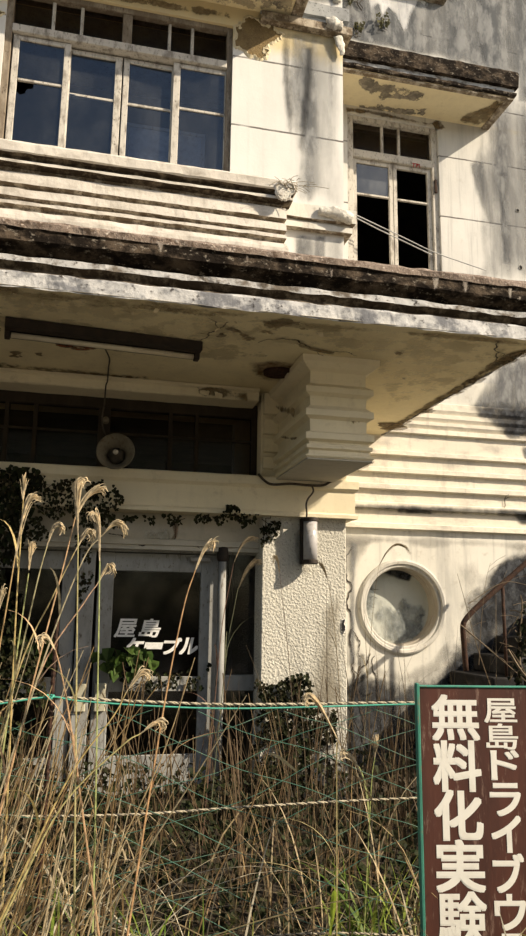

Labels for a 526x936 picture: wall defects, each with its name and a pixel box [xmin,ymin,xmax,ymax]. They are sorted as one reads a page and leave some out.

flaking render [121,0,292,61]
leakage [285,39,319,193]
peeling [346,76,444,130]
leakage [297,236,324,256]
leakage [477,359,526,438]
leakage [355,505,526,524]
leakage [347,555,526,766]